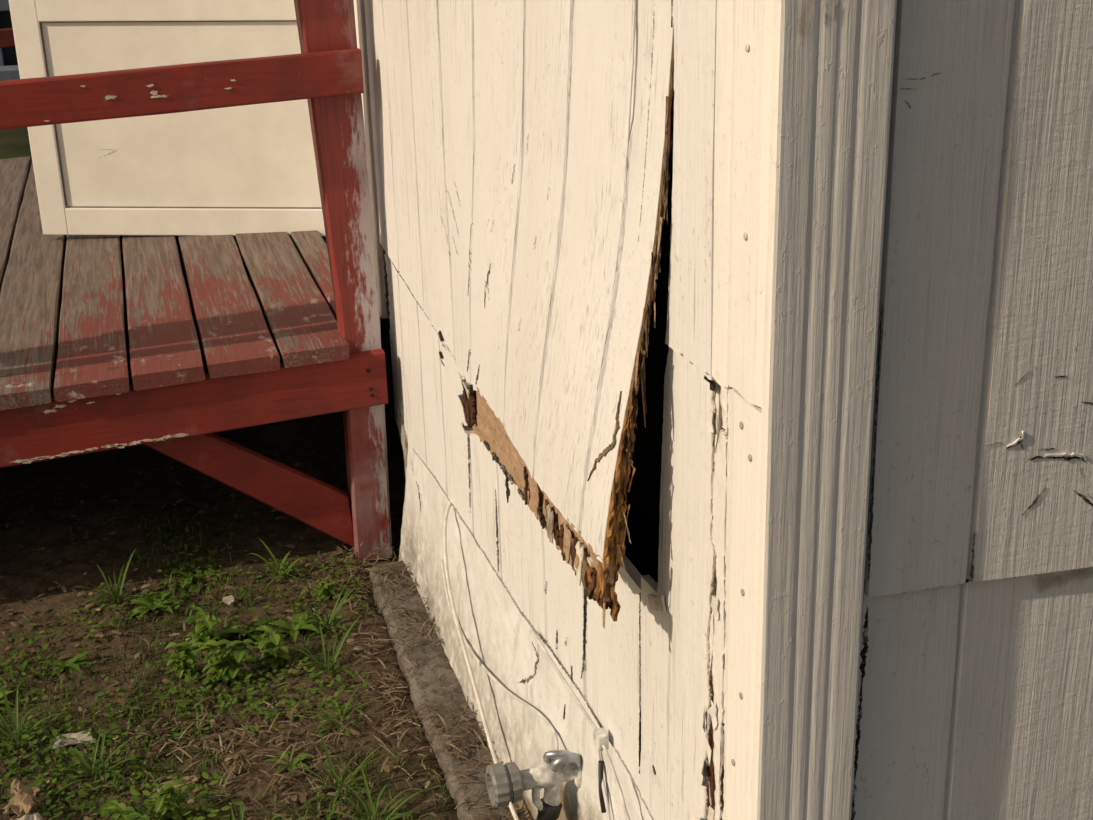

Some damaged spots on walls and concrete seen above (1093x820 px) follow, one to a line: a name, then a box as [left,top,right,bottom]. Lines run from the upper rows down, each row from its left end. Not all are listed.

spalling [456,370,613,602]
crack [998,431,1093,506]
damp [557,787,579,820]